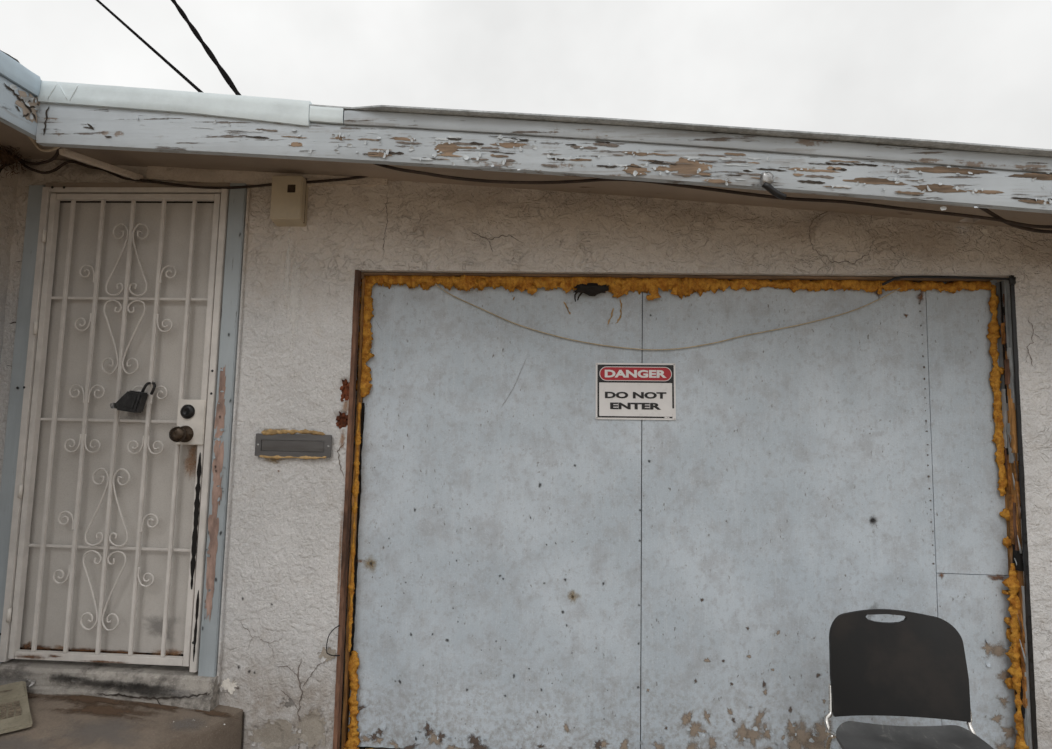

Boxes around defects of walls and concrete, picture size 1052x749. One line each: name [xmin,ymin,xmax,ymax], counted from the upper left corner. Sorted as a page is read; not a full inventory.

peeling [10,84,40,123]
peeling [194,120,312,153]
peeling [332,132,1052,208]
peeling [202,365,231,630]
crack [240,621,322,749]
crack [238,712,246,749]
peeling [360,721,489,749]
peeling [620,727,667,749]
peeling [682,707,836,749]